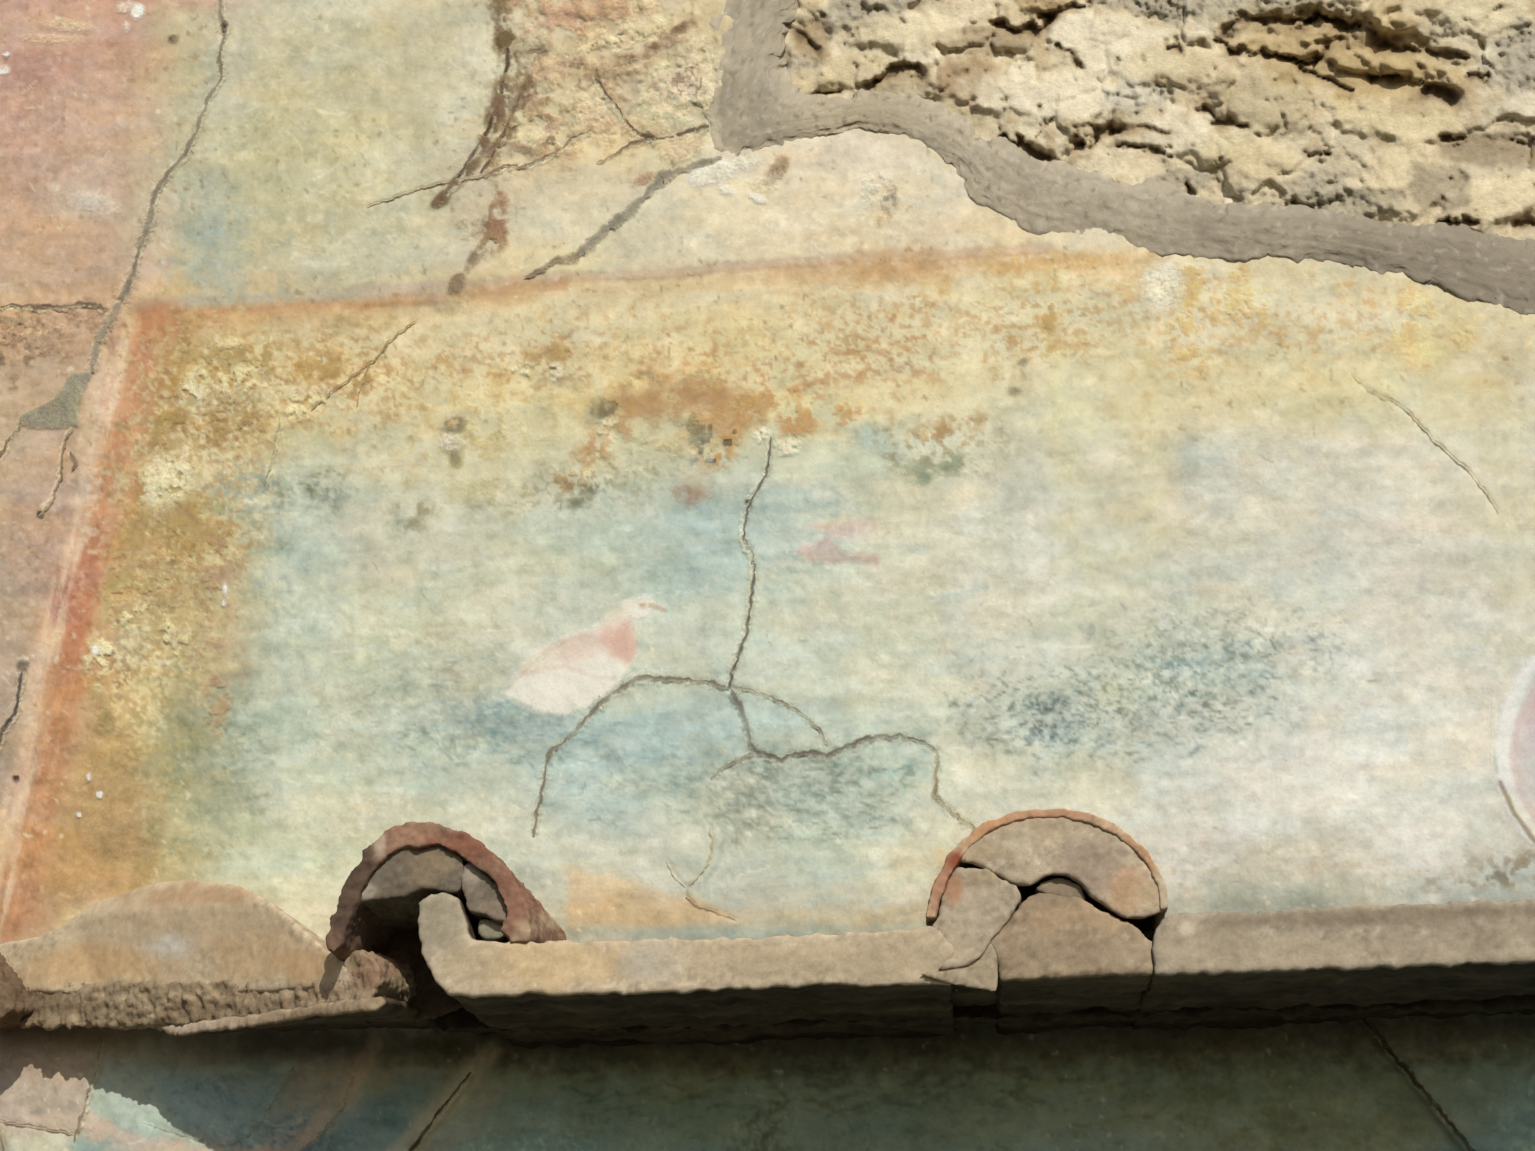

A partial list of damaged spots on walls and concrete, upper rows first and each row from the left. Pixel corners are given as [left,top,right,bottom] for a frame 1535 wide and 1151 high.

crack [0,0,229,372]
crack [367,26,722,278]
spalling [784,0,1535,240]
peeling [1141,269,1179,304]
spalling [0,311,97,388]
crack [41,427,78,517]
crack [532,437,976,836]
crack [0,671,24,749]
crack [666,827,738,919]
crack [409,1072,471,1151]
crack [1364,1019,1476,1151]